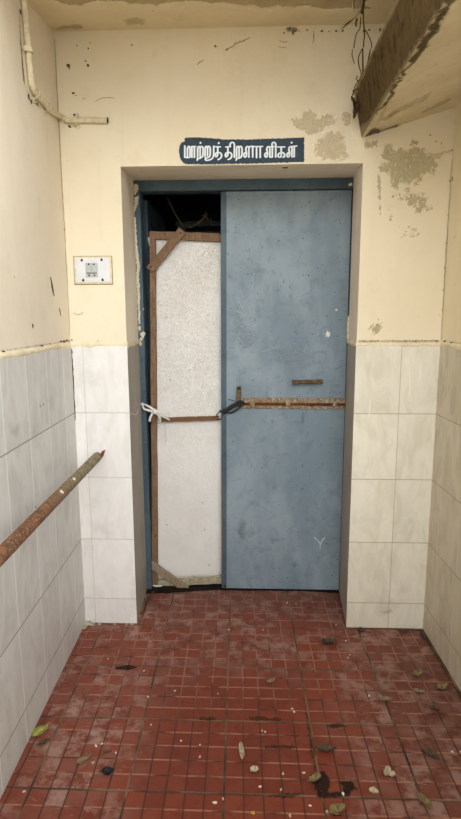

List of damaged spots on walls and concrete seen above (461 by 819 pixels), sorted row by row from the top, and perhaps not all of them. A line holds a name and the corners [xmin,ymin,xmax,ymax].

peeling [289,109,353,160]
peeling [364,134,453,220]